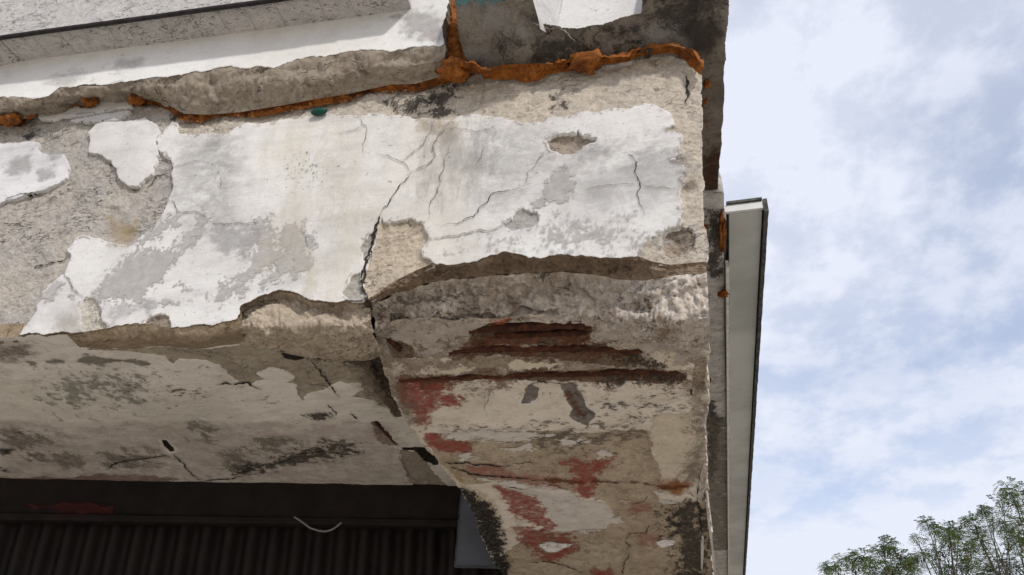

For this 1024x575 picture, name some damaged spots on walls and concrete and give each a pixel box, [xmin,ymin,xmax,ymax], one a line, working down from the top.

crack [582,154,676,211]
crack [337,115,542,407]
peeling [0,44,716,575]
corrosion [396,318,683,390]
damp [34,365,157,421]
crack [219,382,261,390]
damp [300,412,332,420]
crack [308,361,358,420]
damp [0,449,86,472]
crack [109,445,350,481]
damp [231,436,368,476]
corrosion [544,478,690,495]